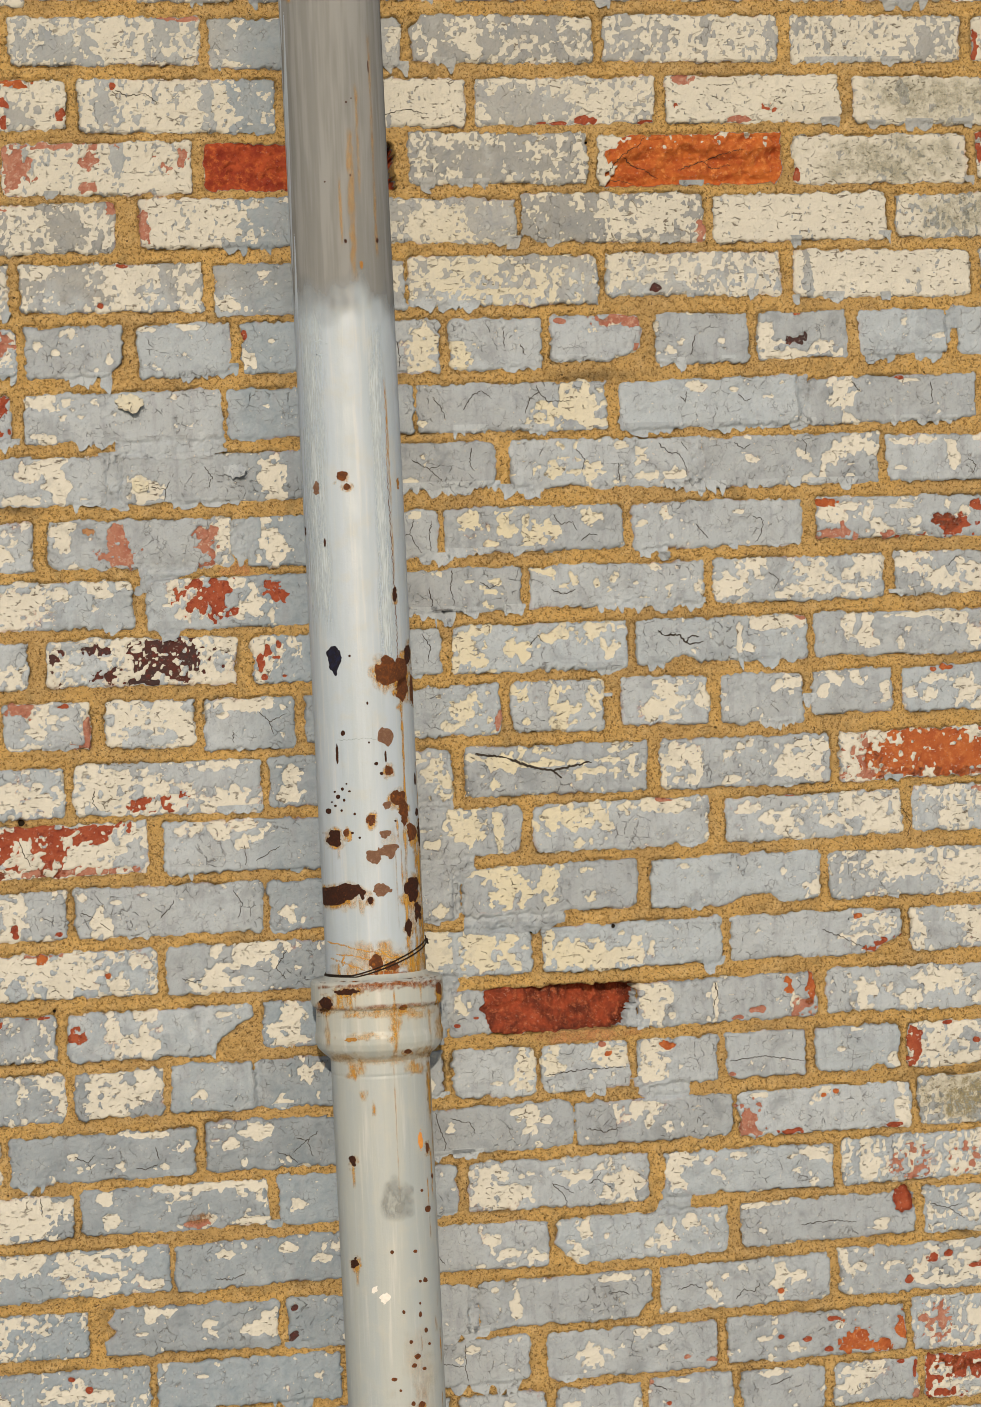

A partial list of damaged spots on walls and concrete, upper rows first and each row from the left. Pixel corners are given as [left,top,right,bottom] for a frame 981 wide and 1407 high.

peeling [0,0,361,1407]
corrosion [374,700,418,816]
spalling [322,0,981,1407]
corrosion [316,820,443,1048]
corrosion [411,1049,432,1112]